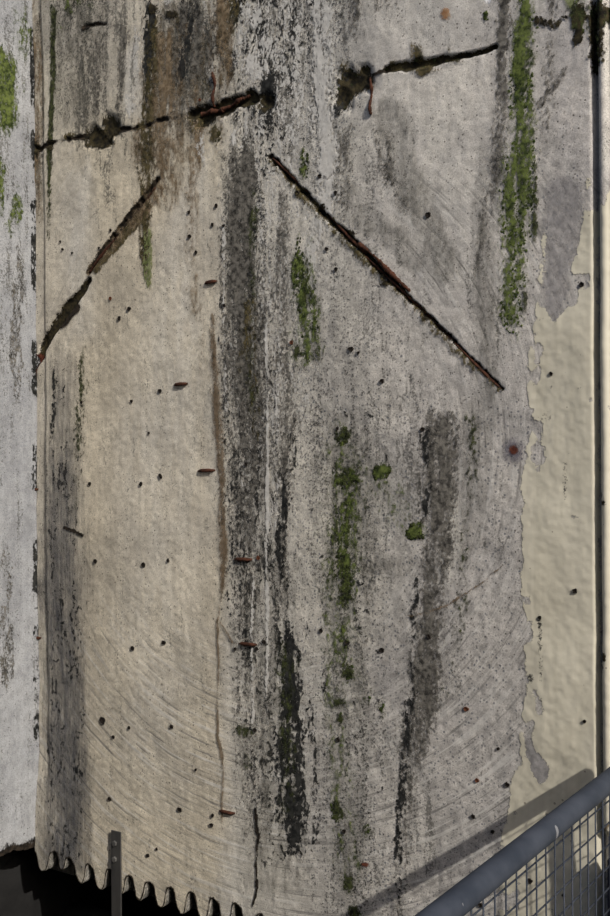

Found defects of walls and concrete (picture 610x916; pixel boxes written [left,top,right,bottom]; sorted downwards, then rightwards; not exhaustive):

leakage [5,0,90,404]
leakage [67,37,107,118]
crack [34,113,182,159]
leakage [371,123,413,209]
crack [372,42,498,77]
leakage [475,0,512,272]
leakage [0,346,92,869]
leakage [115,0,397,857]
leakage [393,406,478,914]
peeling [500,191,610,849]
peeling [499,796,609,916]